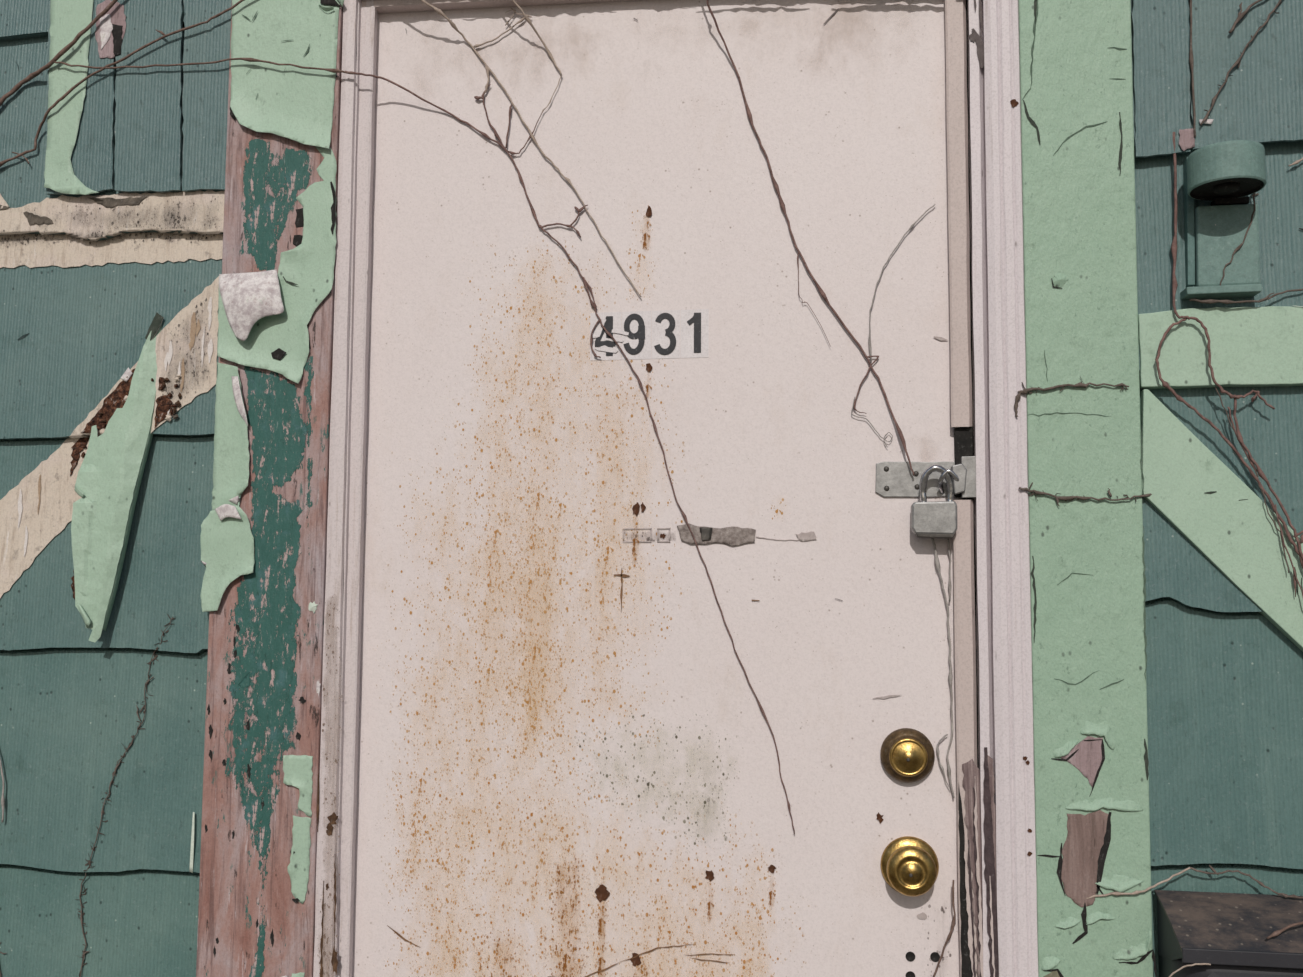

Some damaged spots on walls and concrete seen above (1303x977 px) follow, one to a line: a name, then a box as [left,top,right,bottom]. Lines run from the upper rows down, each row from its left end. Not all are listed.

corrosion [629,205,655,298]
peeling [0,0,344,977]
corrosion [385,245,791,977]
peeling [1037,720,1144,944]
peeling [1041,956,1064,977]
peeling [1113,930,1157,977]